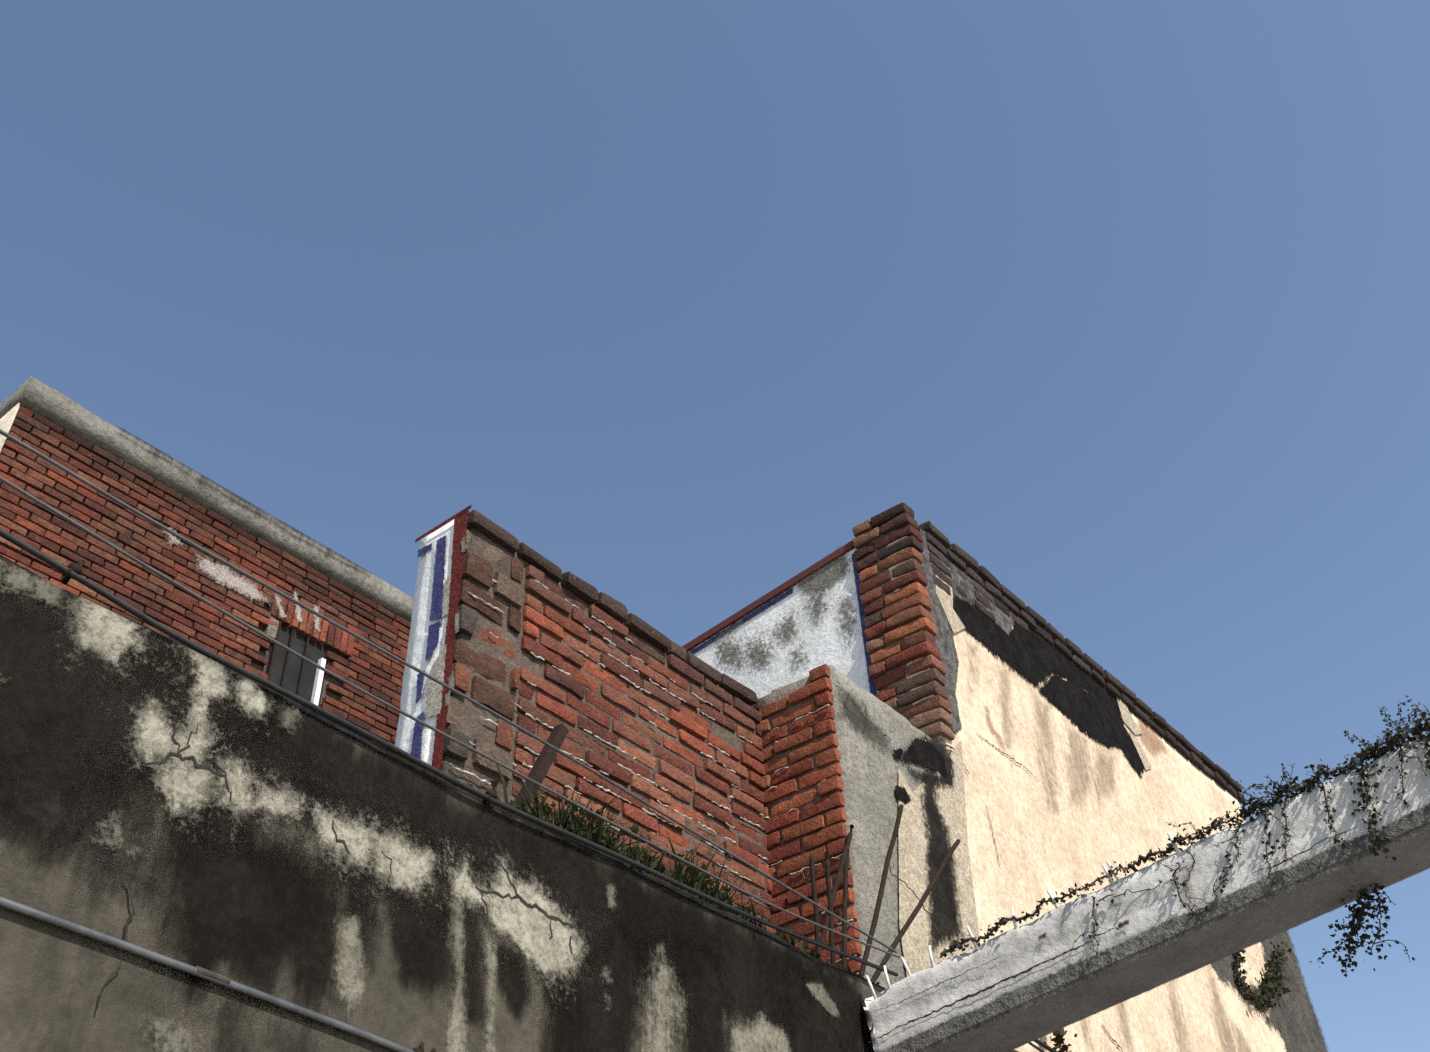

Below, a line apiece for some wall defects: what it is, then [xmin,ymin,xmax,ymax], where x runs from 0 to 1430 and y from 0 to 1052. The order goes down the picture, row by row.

leakage [121,428,371,573]
crack [141,723,232,800]
leakage [0,555,865,1052]
crack [475,864,579,954]